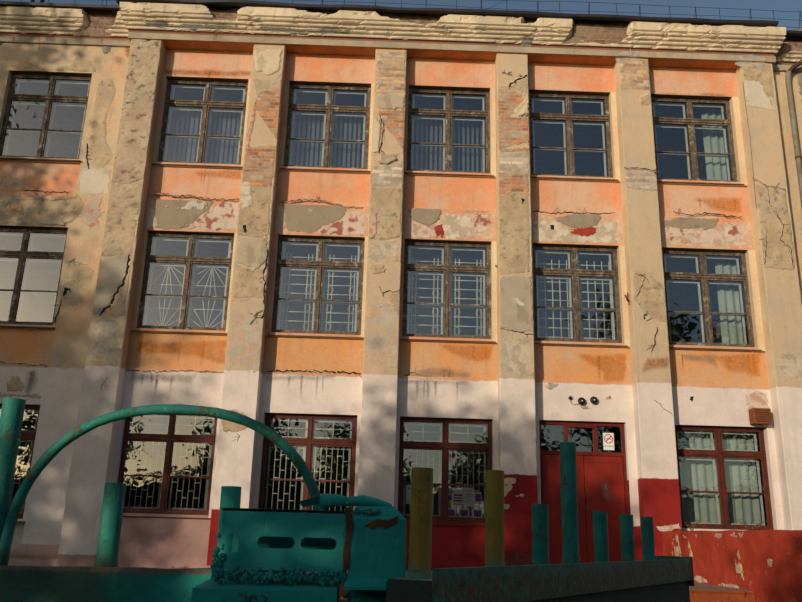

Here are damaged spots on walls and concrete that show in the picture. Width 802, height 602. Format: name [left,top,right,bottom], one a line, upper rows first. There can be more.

flaking render [73,10,117,54]
peeling [143,6,240,30]
peeling [257,26,354,35]
flaking render [378,13,447,25]
flaking render [0,39,624,321]
flaking render [660,184,795,271]
peeling [226,264,266,373]
peeling [365,290,399,368]
flaking render [221,407,249,432]
peeling [504,477,525,509]
peeling [656,523,697,557]
peeling [718,550,744,589]